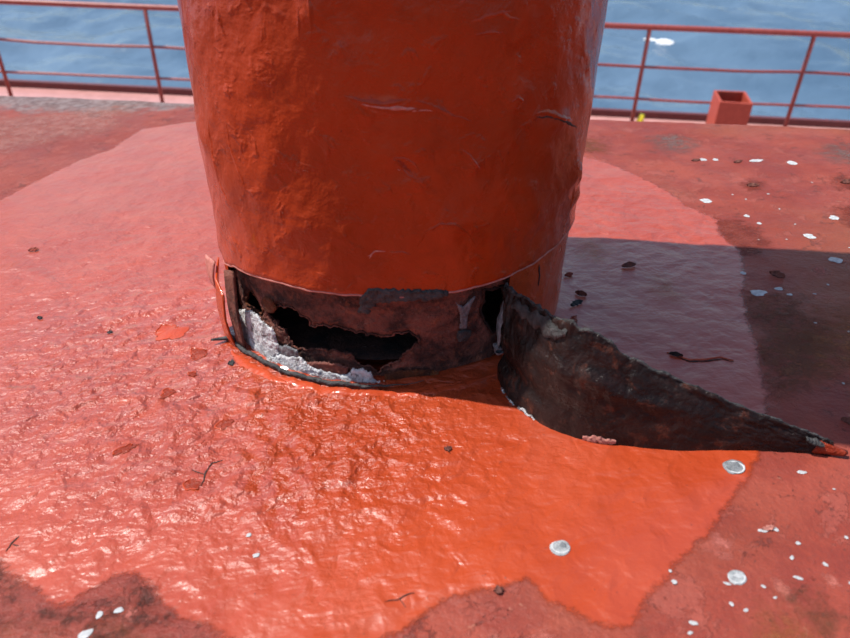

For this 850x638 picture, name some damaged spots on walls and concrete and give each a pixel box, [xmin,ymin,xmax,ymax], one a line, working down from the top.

peeling [511,299,567,340]
peeling [570,290,587,322]
rust [211,335,439,389]
peeling [582,435,616,445]
peeling [806,436,825,448]